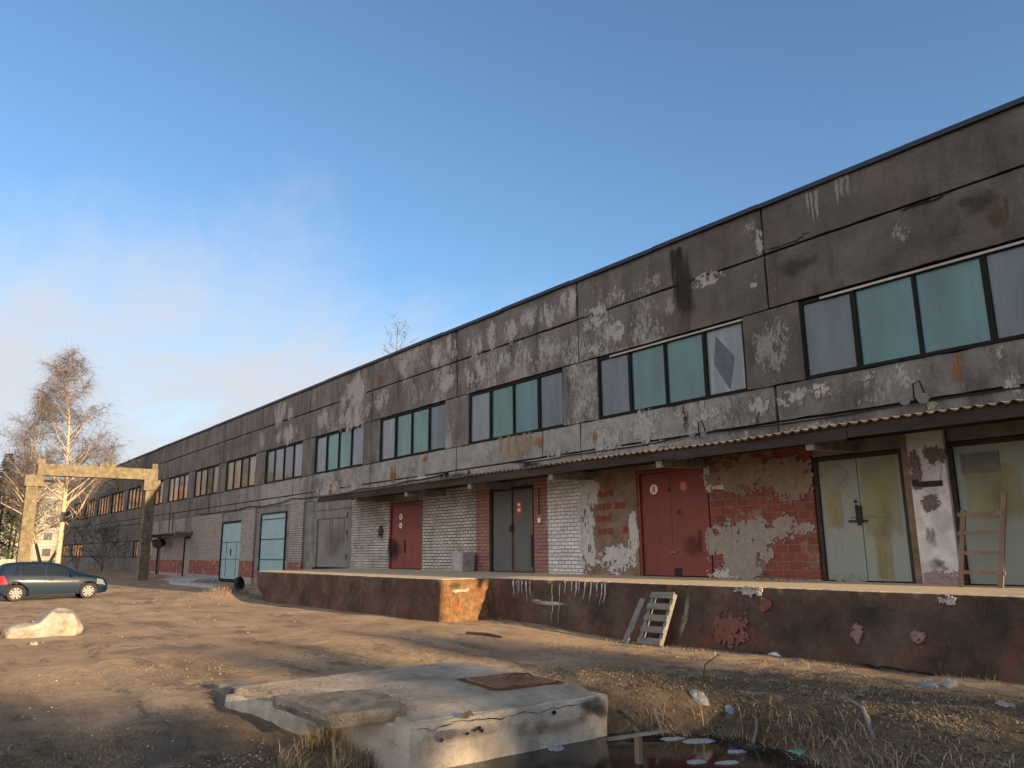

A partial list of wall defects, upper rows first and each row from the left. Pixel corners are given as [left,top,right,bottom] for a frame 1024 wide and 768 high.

leakage [670,247,691,313]
peeling [746,309,831,416]
peeling [313,370,389,433]
spalling [907,445,949,513]
peeling [577,477,640,575]
spalling [699,453,851,649]
leakage [512,580,606,616]
peeling [850,622,864,644]
peeling [909,630,927,644]
crack [414,703,584,732]